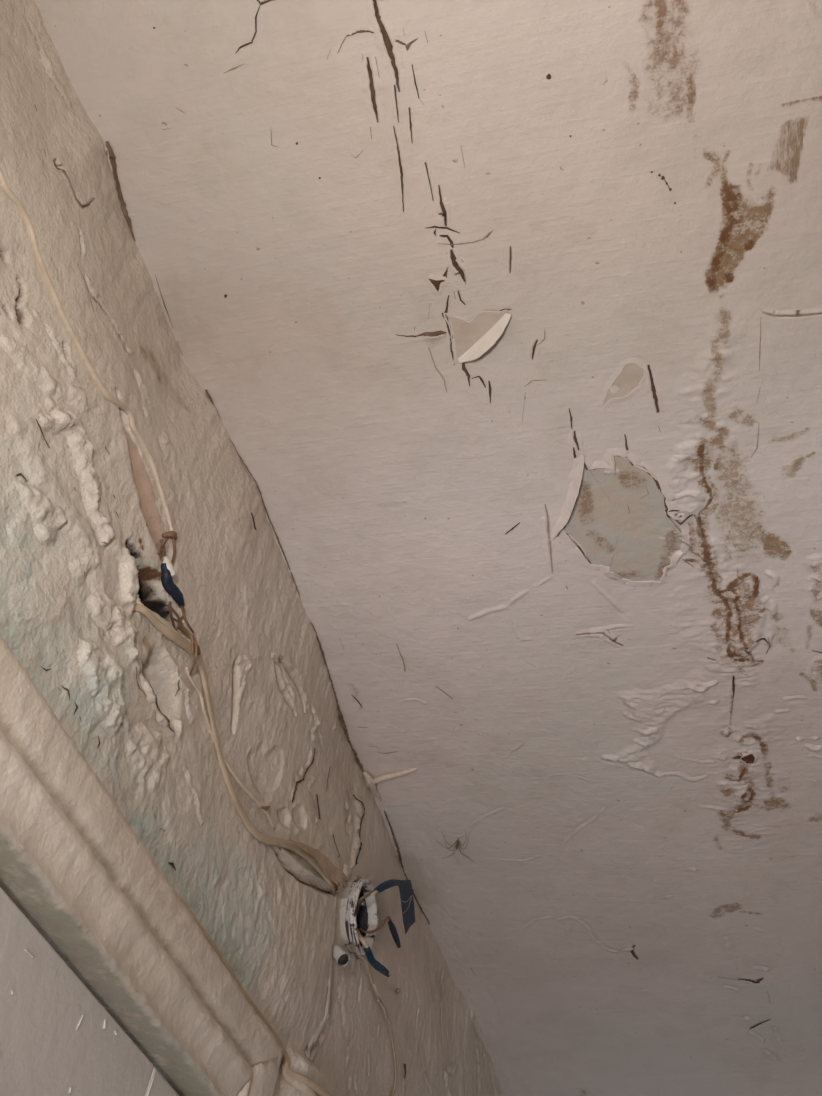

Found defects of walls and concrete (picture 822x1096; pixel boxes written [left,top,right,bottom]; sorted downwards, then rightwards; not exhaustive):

crack [223,0,295,74]
water stain [643,0,687,69]
crack [44,141,136,242]
crack [351,0,517,330]
water stain [776,119,805,182]
peeling [395,308,511,403]
water stain [704,312,731,417]
spalling [548,448,691,587]
water stain [717,449,792,560]